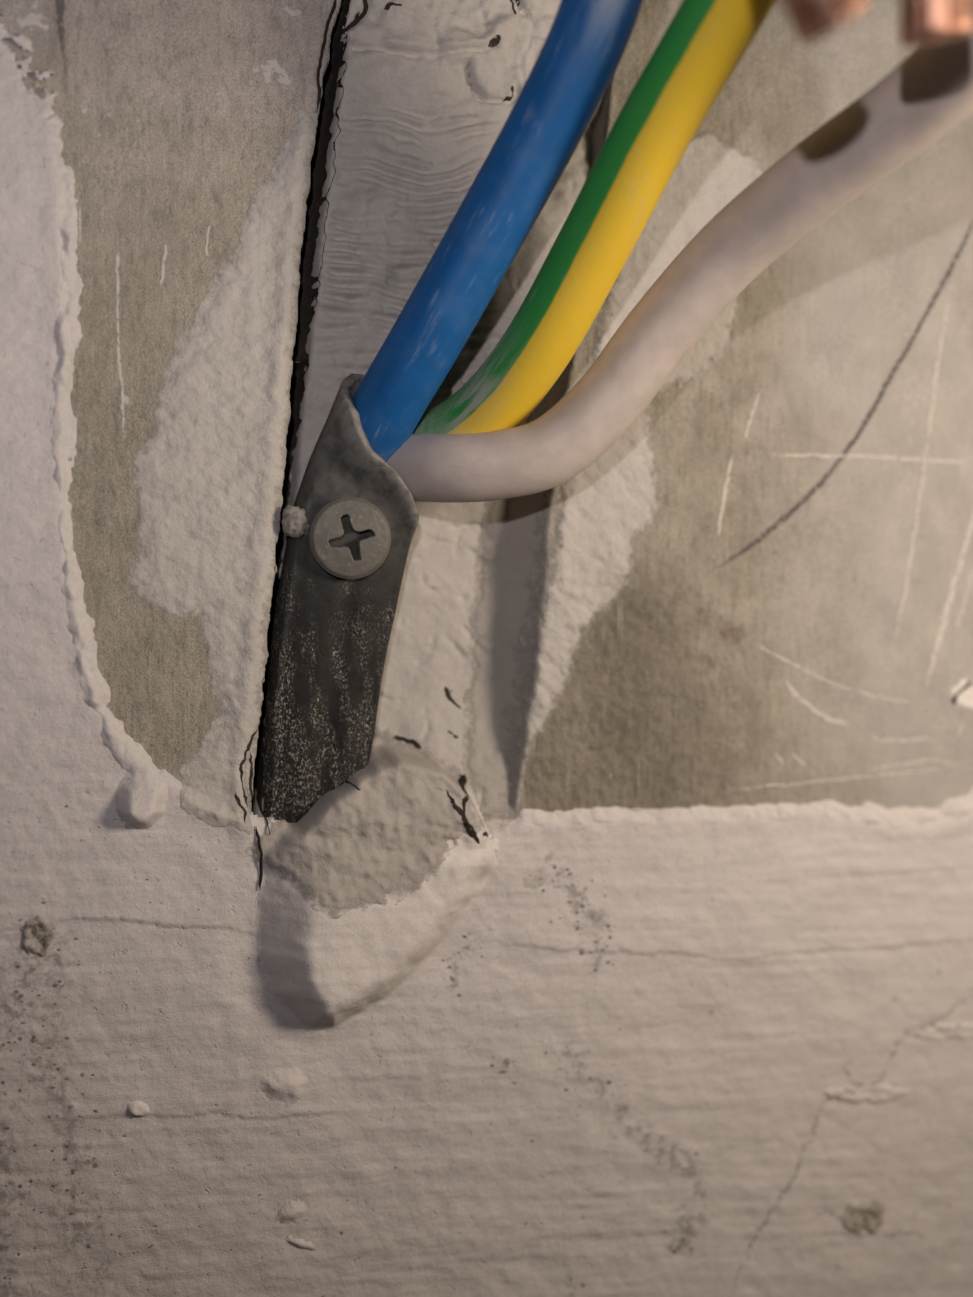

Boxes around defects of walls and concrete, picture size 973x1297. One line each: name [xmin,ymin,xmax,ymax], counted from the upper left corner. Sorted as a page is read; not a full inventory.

peeling [51,163,152,773]
crack [235,0,402,890]
crack [394,686,461,749]
spalling [950,679,973,711]
crack [446,775,488,844]
peeling [519,787,973,828]